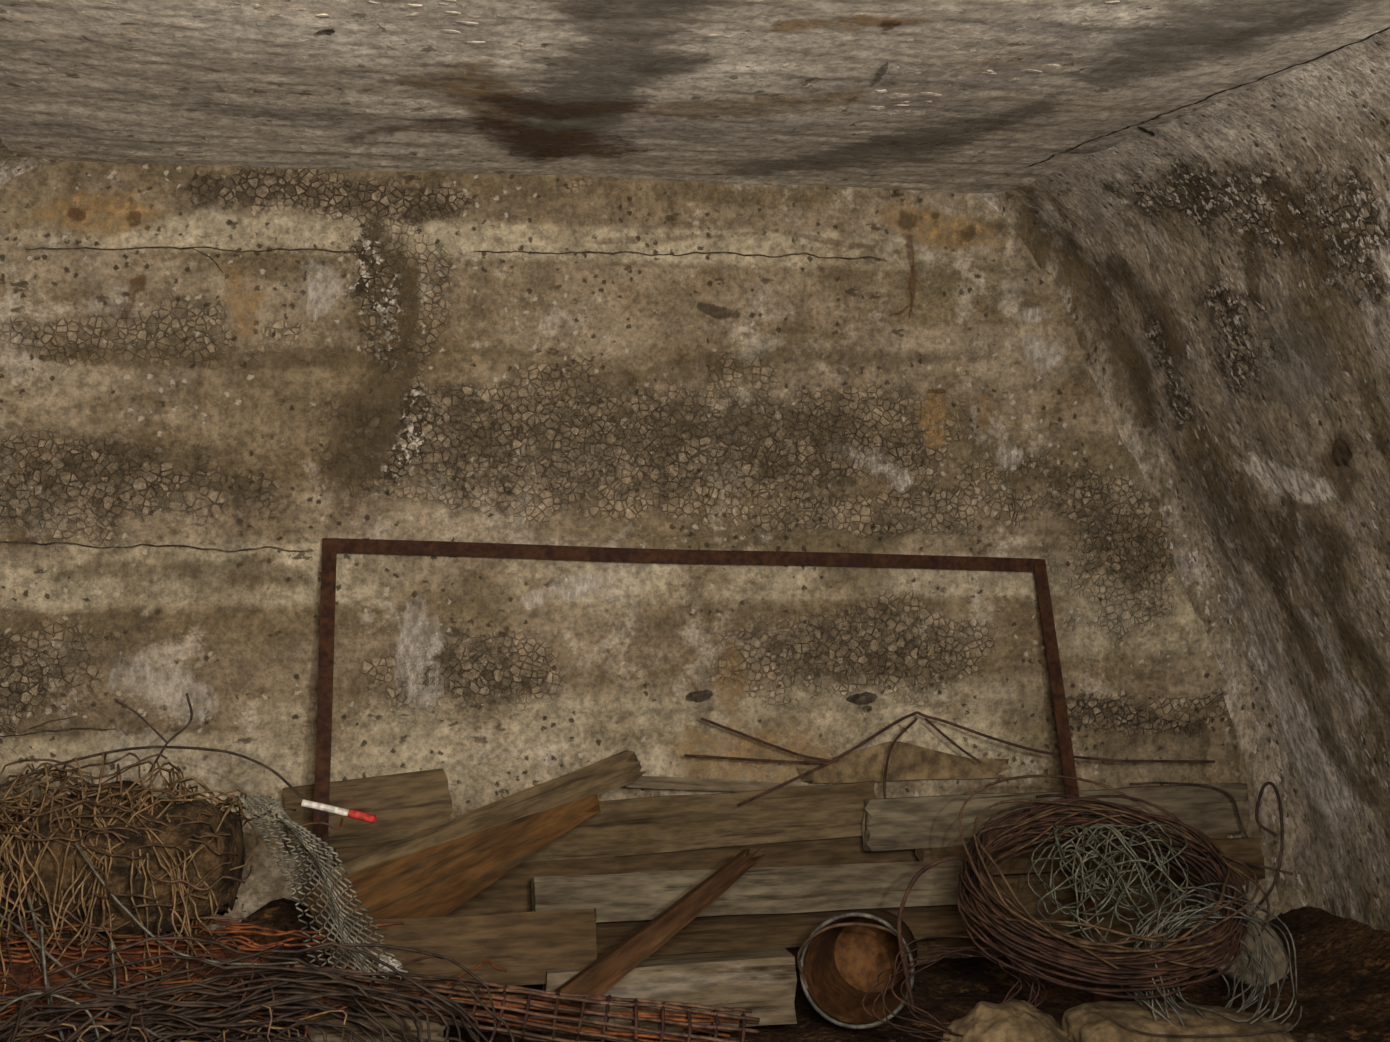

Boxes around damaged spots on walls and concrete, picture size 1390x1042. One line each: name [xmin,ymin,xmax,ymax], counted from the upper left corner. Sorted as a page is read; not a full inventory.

damp [498,0,732,162]
damp [1073,0,1349,86]
damp [1267,179,1332,273]
damp [1373,191,1390,300]